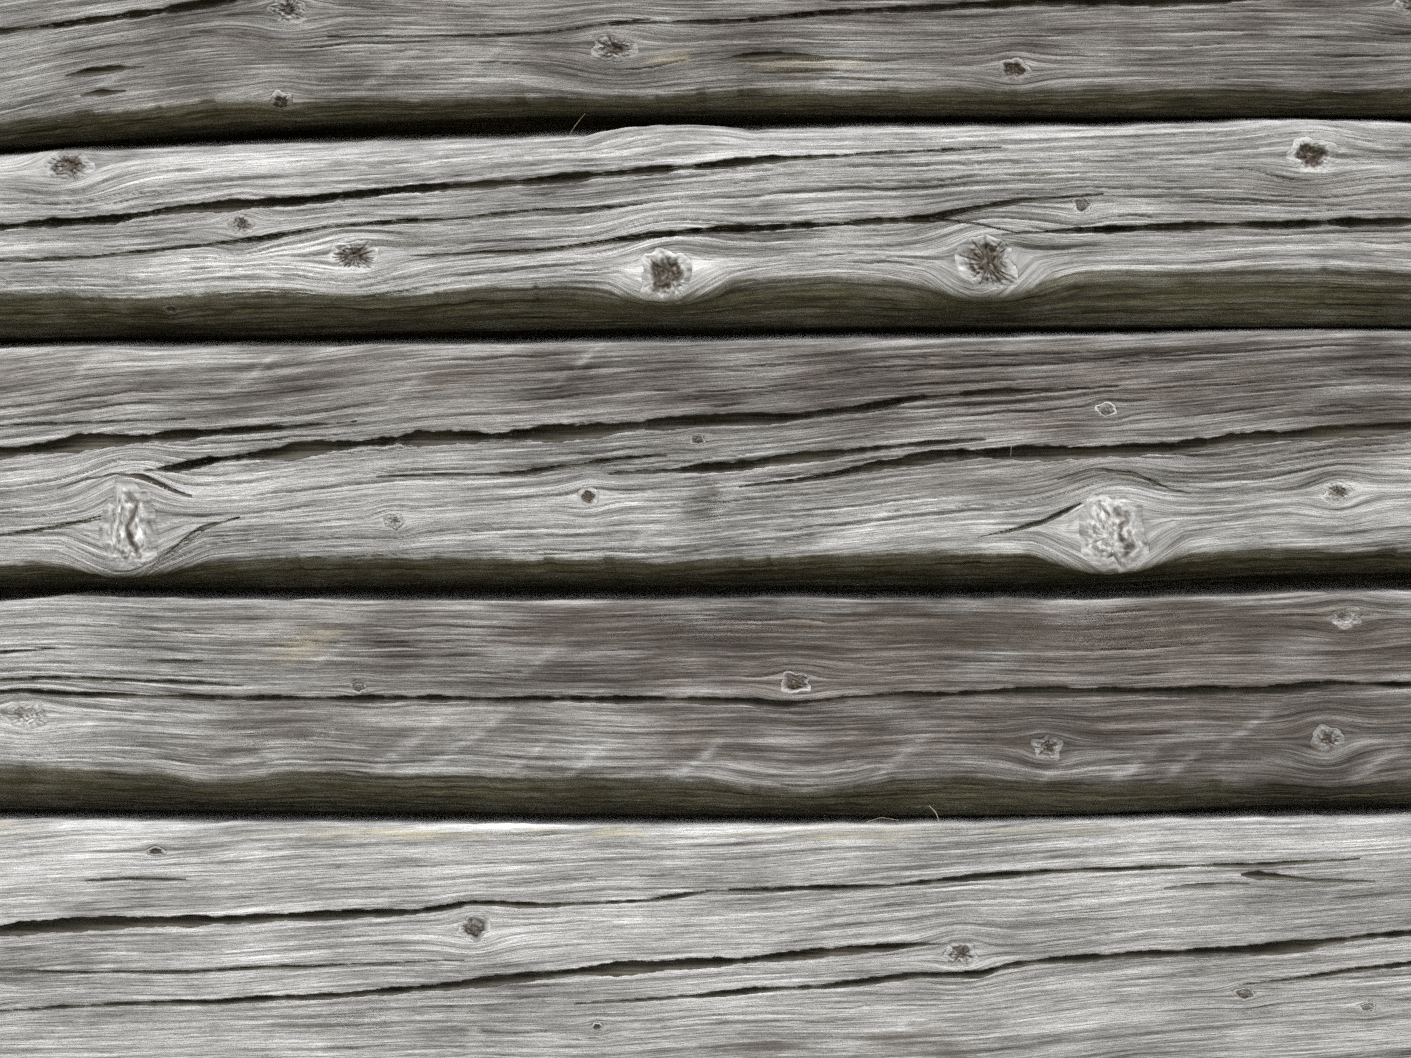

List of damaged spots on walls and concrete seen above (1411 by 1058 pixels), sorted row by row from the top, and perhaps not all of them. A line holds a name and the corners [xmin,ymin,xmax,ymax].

crack [0,147,1411,262]
crack [0,385,1411,573]
crack [0,858,1411,1012]